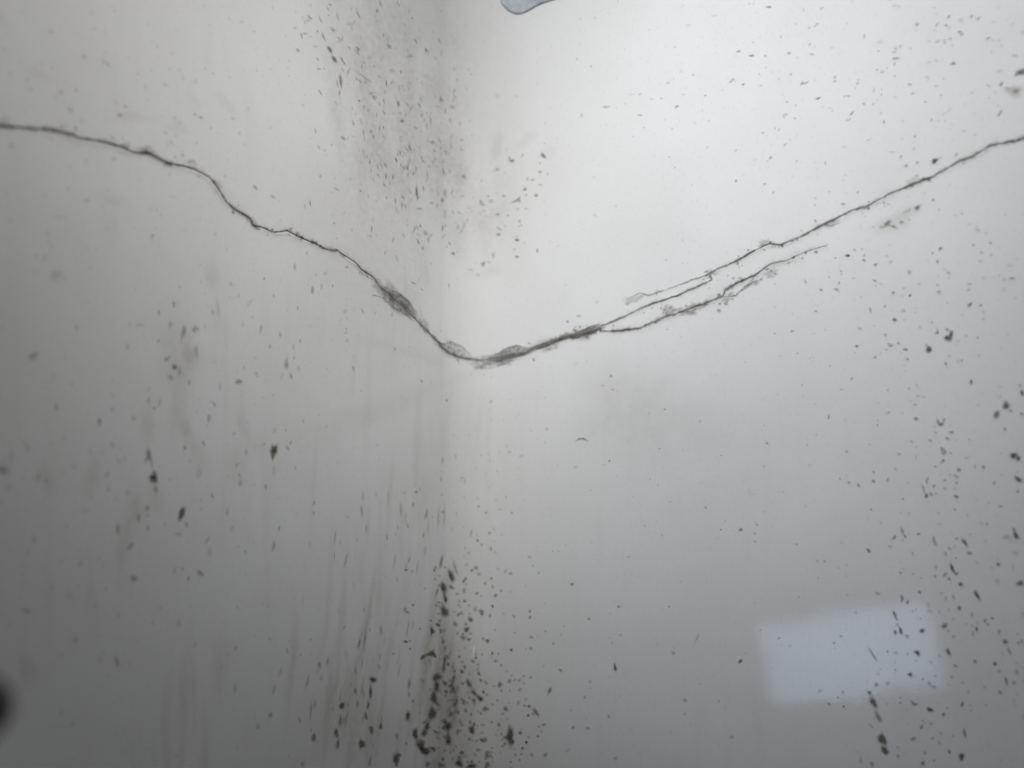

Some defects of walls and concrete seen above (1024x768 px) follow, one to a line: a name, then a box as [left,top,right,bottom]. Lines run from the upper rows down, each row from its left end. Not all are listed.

crack [0,119,1024,364]
mould [420,559,512,659]
mould [394,651,502,766]